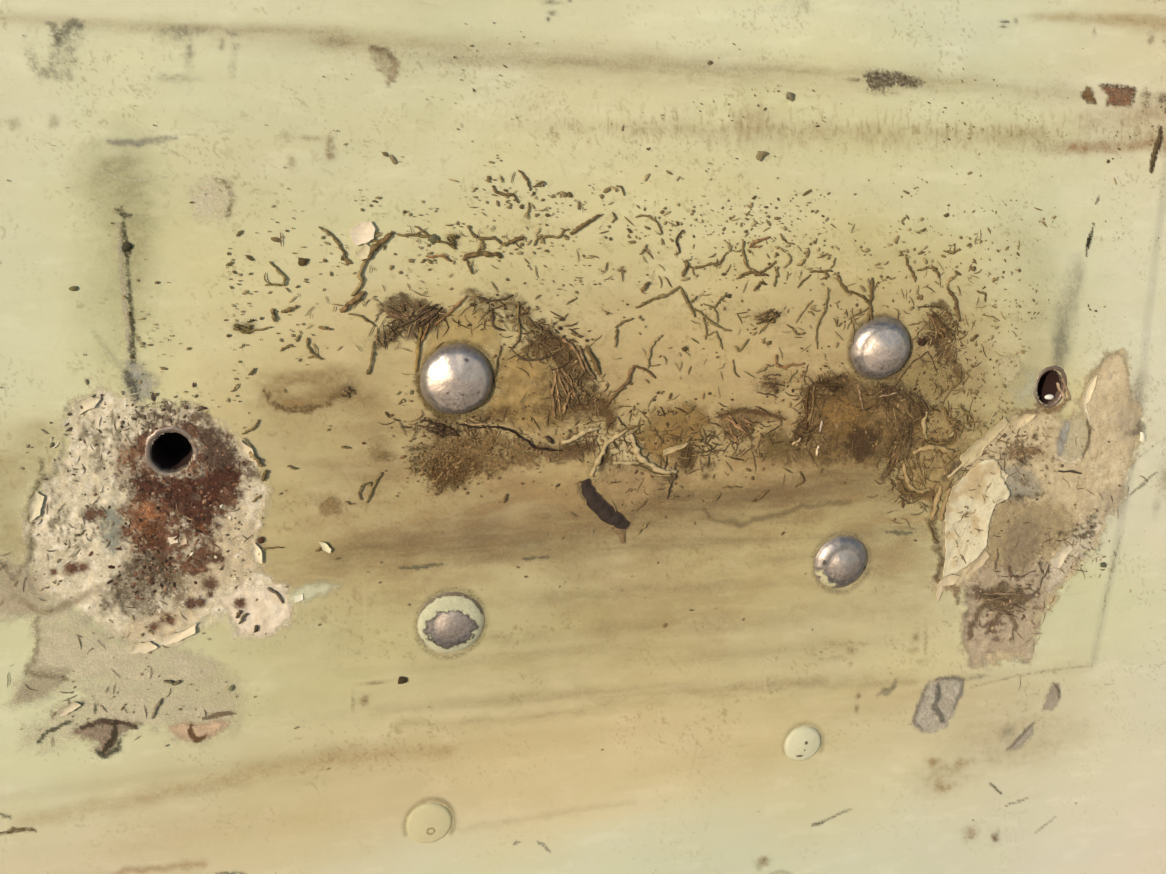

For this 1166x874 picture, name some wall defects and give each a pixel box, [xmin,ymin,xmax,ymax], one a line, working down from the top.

leakage [263,375,341,413]
corrosion [51,551,93,575]
peeling [0,364,336,747]
corrosion [83,423,267,631]
leakage [463,451,699,551]
leakage [700,421,904,520]
peeling [928,348,1146,677]
peeling [912,677,963,733]
peeling [1043,684,1060,711]